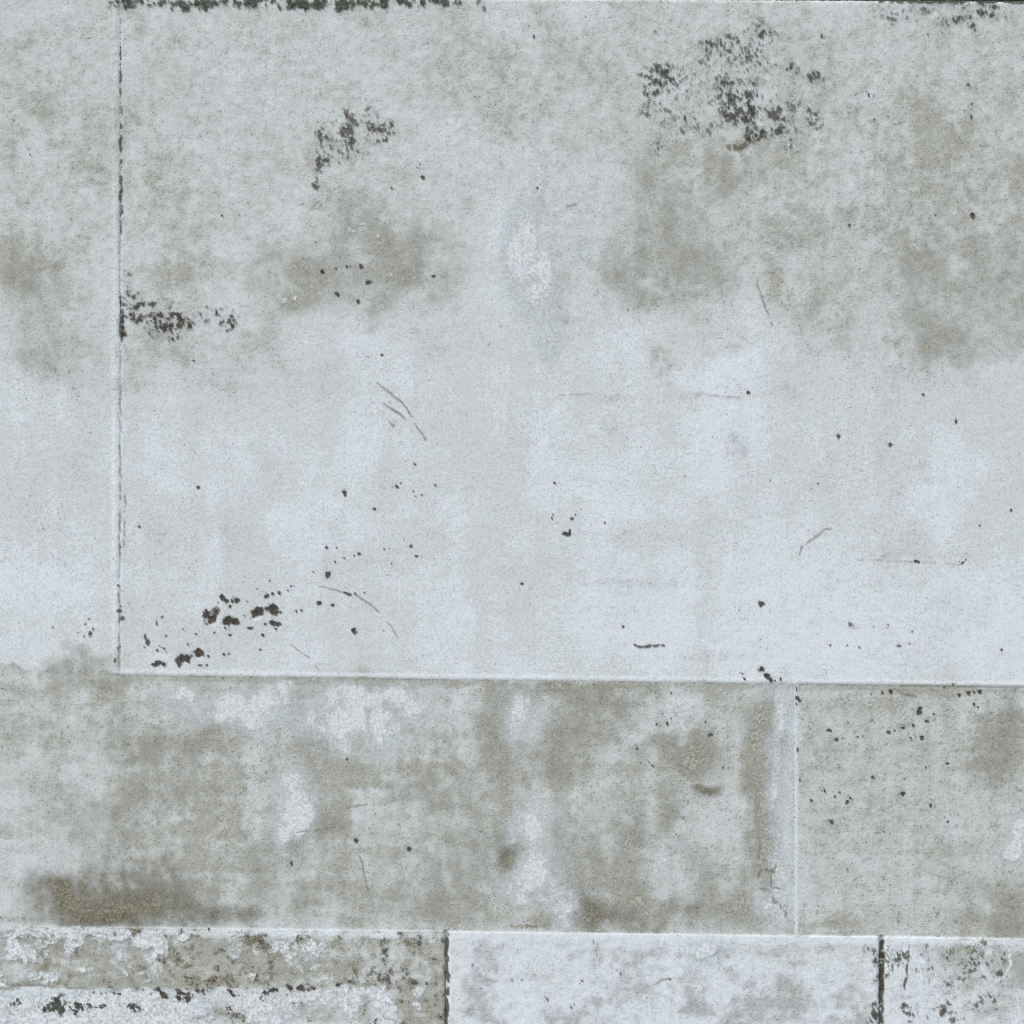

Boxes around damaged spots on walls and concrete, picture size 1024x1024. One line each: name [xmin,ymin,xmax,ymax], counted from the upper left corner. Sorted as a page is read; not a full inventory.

damp [637,20,825,150]
spalling [144,580,289,667]
damp [167,680,436,759]
damp [483,685,583,775]
damp [275,768,338,847]
damp [505,801,675,929]
damp [688,690,789,919]
damp [1001,815,1024,861]
peeling [0,926,214,1024]
peeling [228,928,402,1024]
peeling [412,986,425,1011]